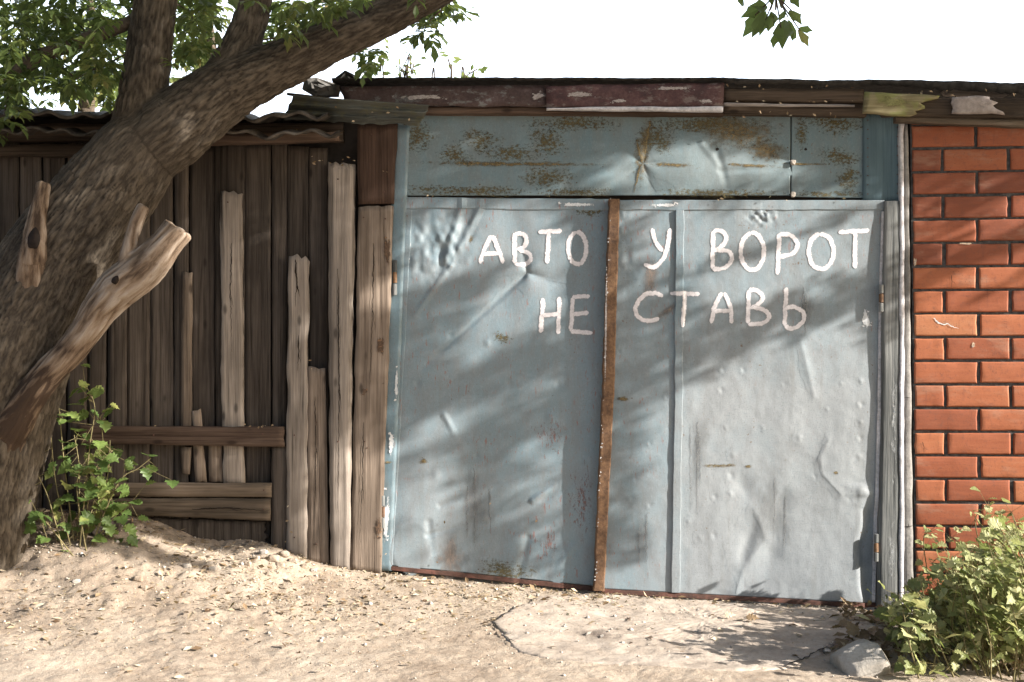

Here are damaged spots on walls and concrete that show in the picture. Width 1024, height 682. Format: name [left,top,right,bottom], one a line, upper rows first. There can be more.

rust [404,116,621,198]
rust [634,116,863,198]